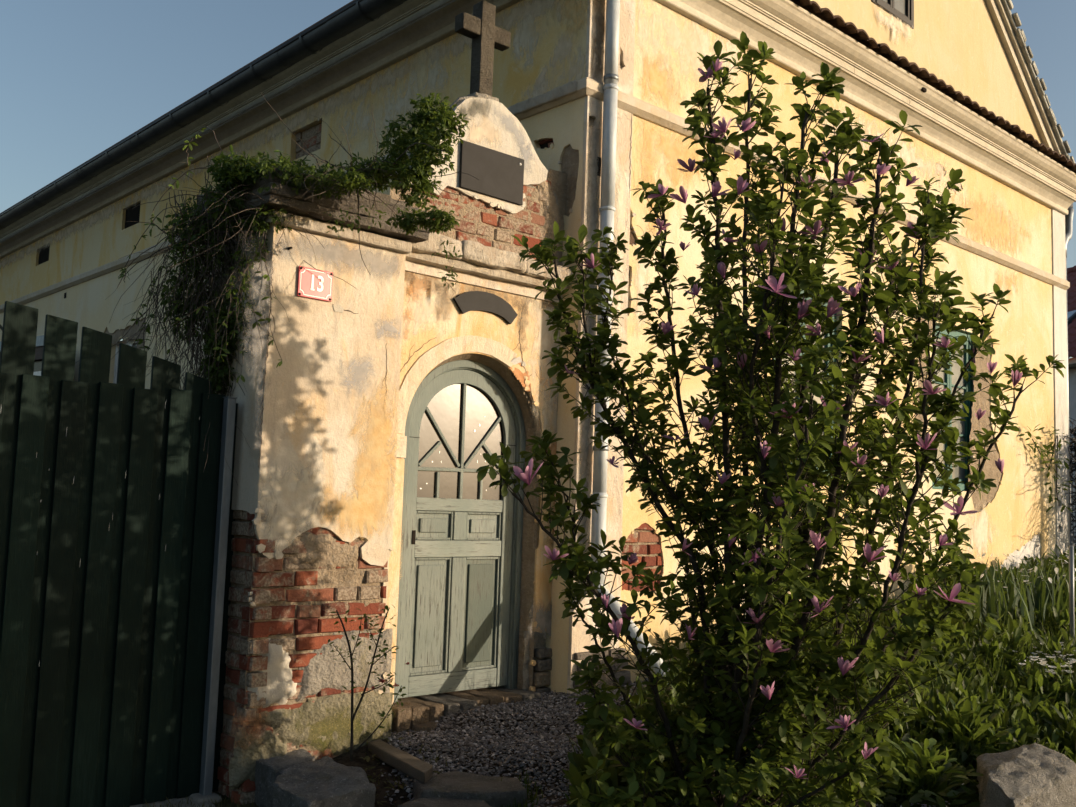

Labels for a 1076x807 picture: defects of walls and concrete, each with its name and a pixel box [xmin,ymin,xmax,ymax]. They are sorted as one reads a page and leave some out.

flaking render [390,138,579,266]
flaking render [621,523,665,592]
flaking render [1003,533,1041,573]
flaking render [217,507,393,805]